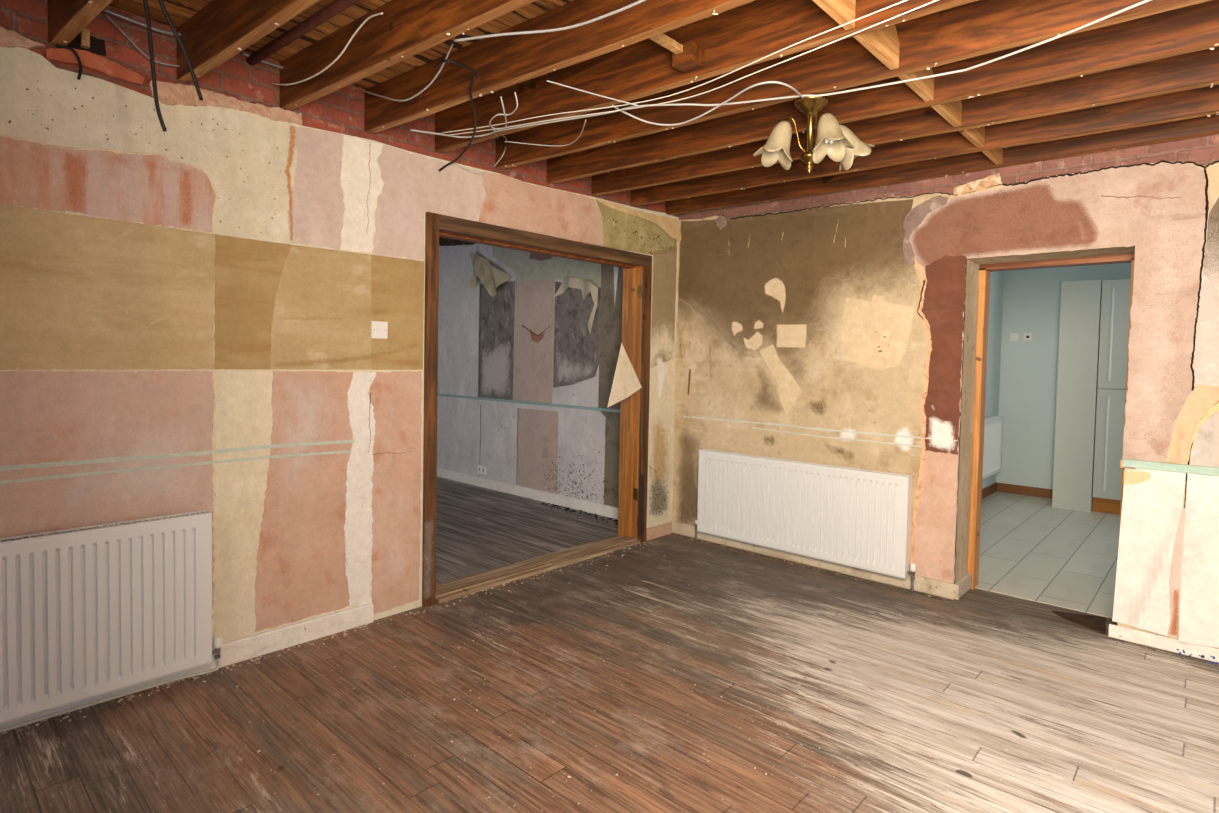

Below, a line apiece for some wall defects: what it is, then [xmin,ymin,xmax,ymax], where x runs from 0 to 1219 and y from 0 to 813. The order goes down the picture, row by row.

peeling [0,26,345,250]
water stain [478,281,515,400]
peeling [372,145,681,333]
water stain [543,264,623,507]
water stain [595,199,690,368]
crack [730,191,975,220]
crack [917,280,925,320]
peeling [903,163,1219,583]
crack [1003,160,1219,508]
peeling [0,369,423,632]